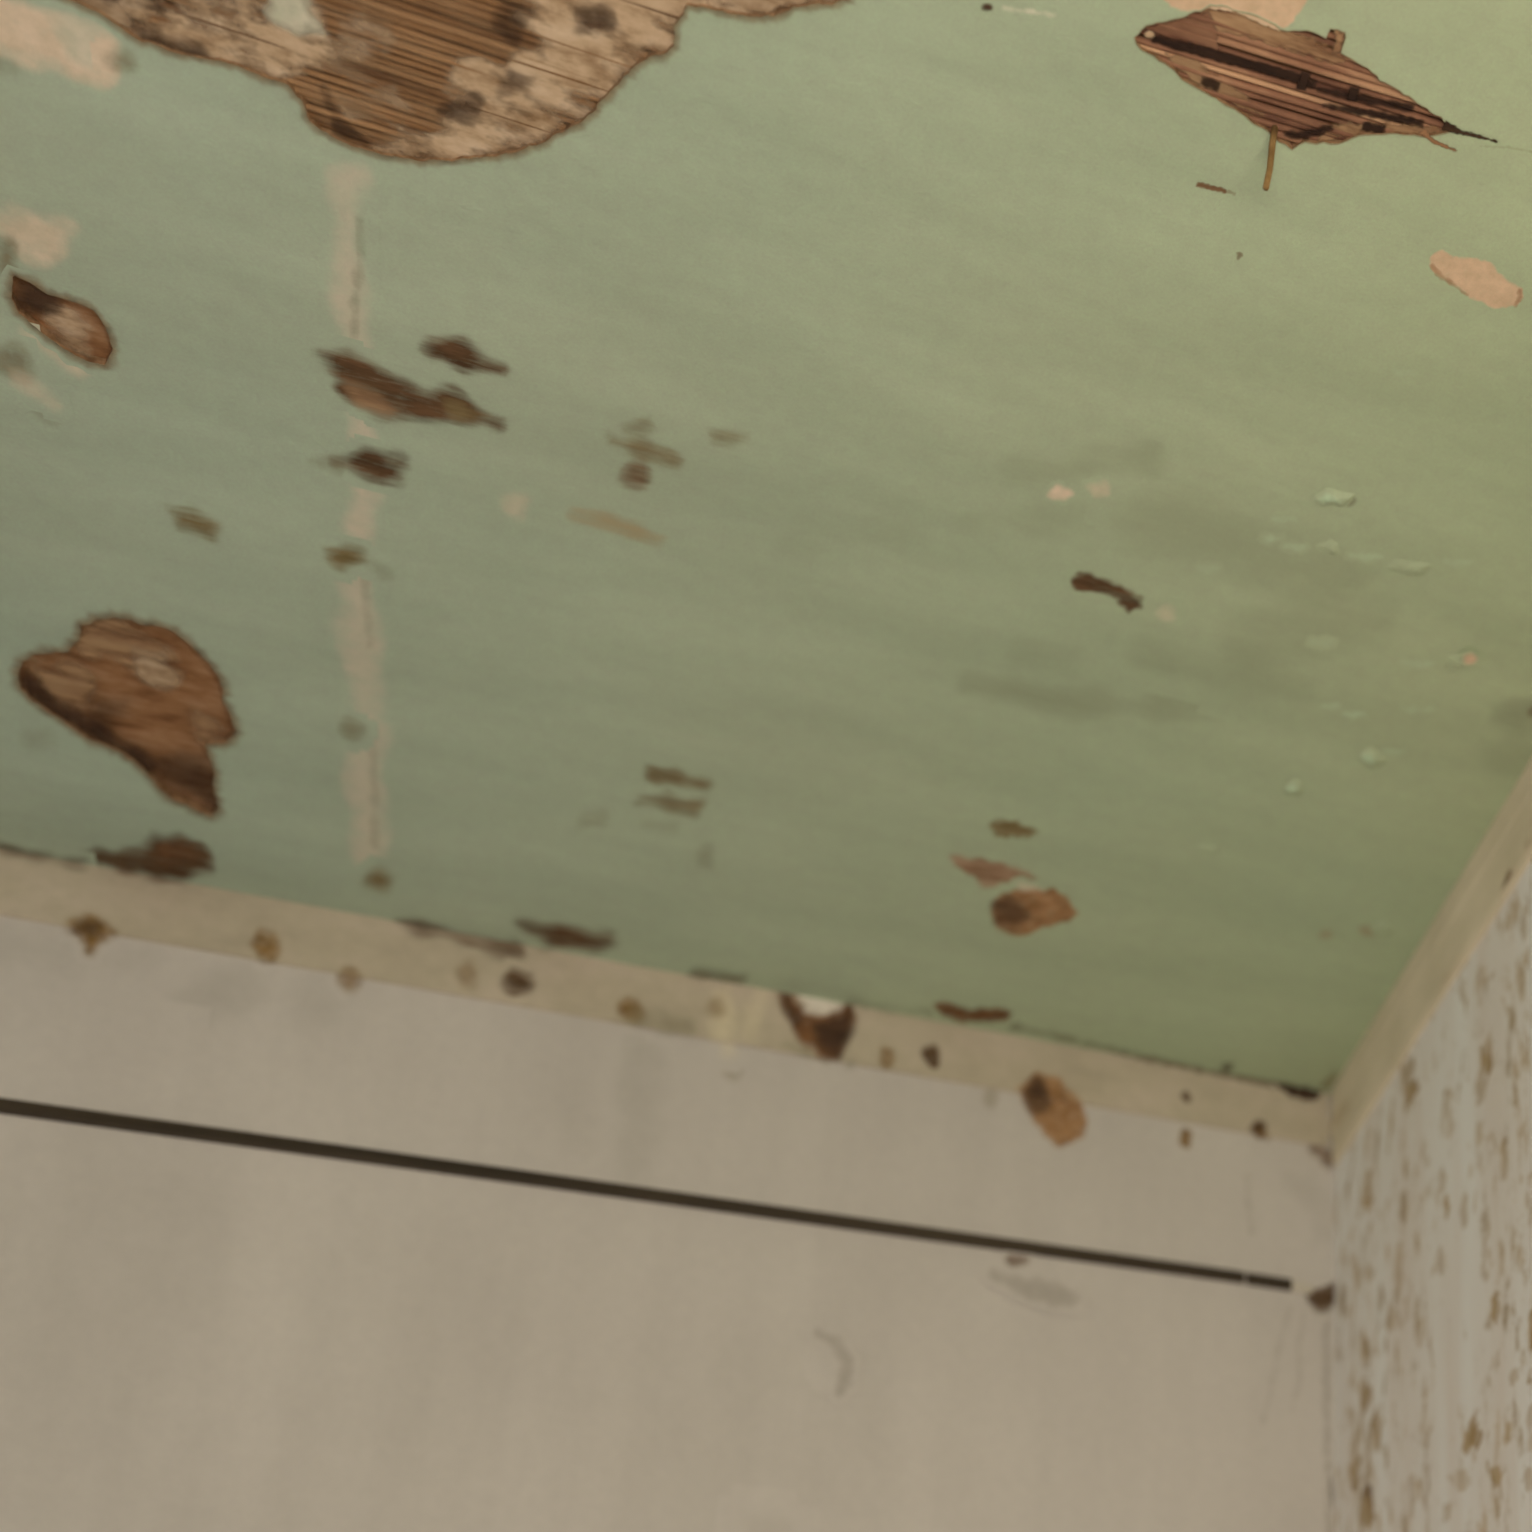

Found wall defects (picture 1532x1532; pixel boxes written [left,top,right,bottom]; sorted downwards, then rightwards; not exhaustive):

flaking render [0,0,860,172]
flaking render [1133,0,1498,191]
flaking render [0,189,125,391]
peeling [1426,247,1526,311]
flaking render [296,323,521,500]
peeling [1041,474,1117,506]
flaking render [1066,567,1184,628]
flaking render [2,602,251,896]
flaking render [944,815,1083,940]
peeling [696,979,865,1092]
flaking render [1011,1066,1091,1154]